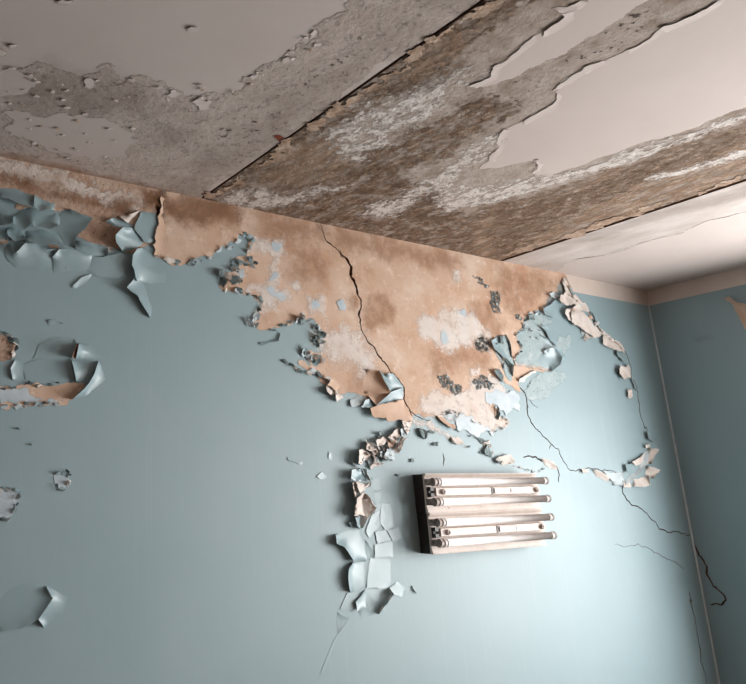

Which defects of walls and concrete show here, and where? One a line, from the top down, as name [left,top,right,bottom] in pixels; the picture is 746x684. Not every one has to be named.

water stain [0,0,746,261]
peeling [0,0,746,470]
crack [320,223,429,421]
peeling [0,485,21,522]
peeling [54,469,71,491]
peeling [335,466,404,619]
peeling [495,454,558,473]
peeling [582,431,660,487]
crack [520,388,727,683]